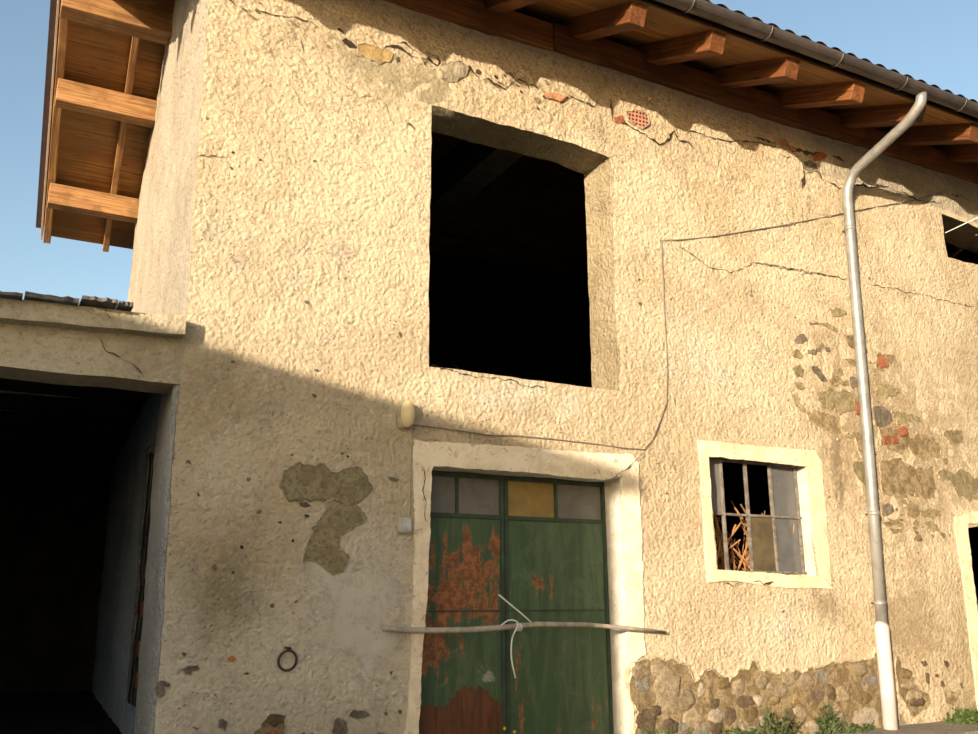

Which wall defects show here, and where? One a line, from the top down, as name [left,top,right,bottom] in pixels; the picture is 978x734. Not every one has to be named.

spalling [326,28,427,65]
crack [384,41,441,67]
spalling [438,61,523,93]
crack [471,69,541,90]
crack [569,95,972,203]
crack [679,246,847,296]
crack [870,284,972,307]
crack [96,313,143,375]
peeling [792,308,978,554]
peeling [279,452,373,576]
spalling [252,711,287,734]
spalling [331,709,371,734]